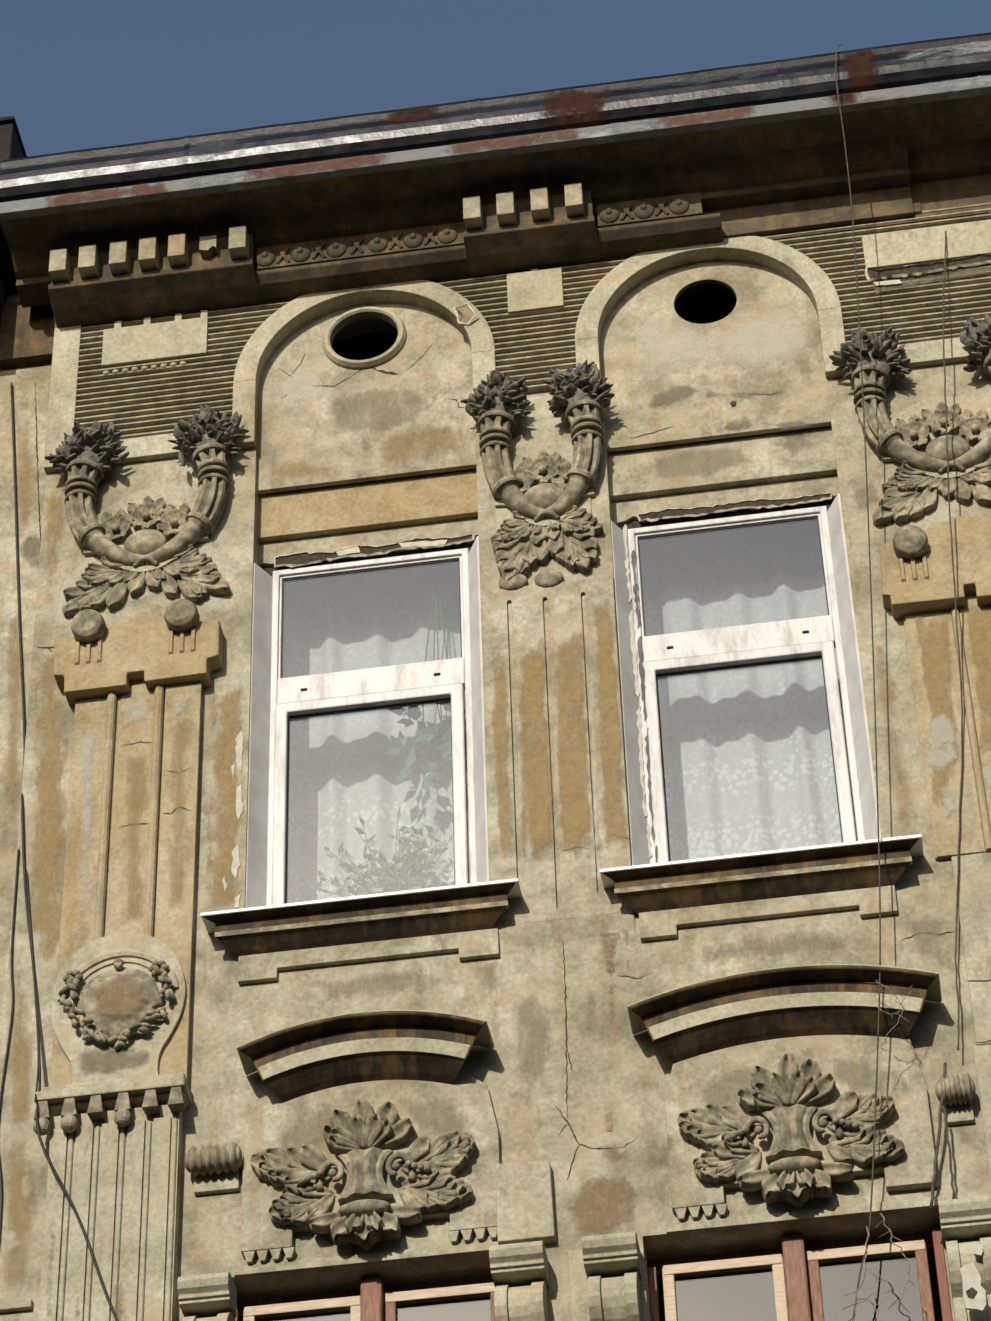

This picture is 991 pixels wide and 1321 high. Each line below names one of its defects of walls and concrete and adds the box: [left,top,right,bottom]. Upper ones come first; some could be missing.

rust [830,49,878,104]
rust [390,107,435,122]
rust [454,89,604,153]
peeling [231,732,244,820]
peeling [222,843,242,908]
crack [557,941,634,1179]
leakage [574,1179,634,1234]